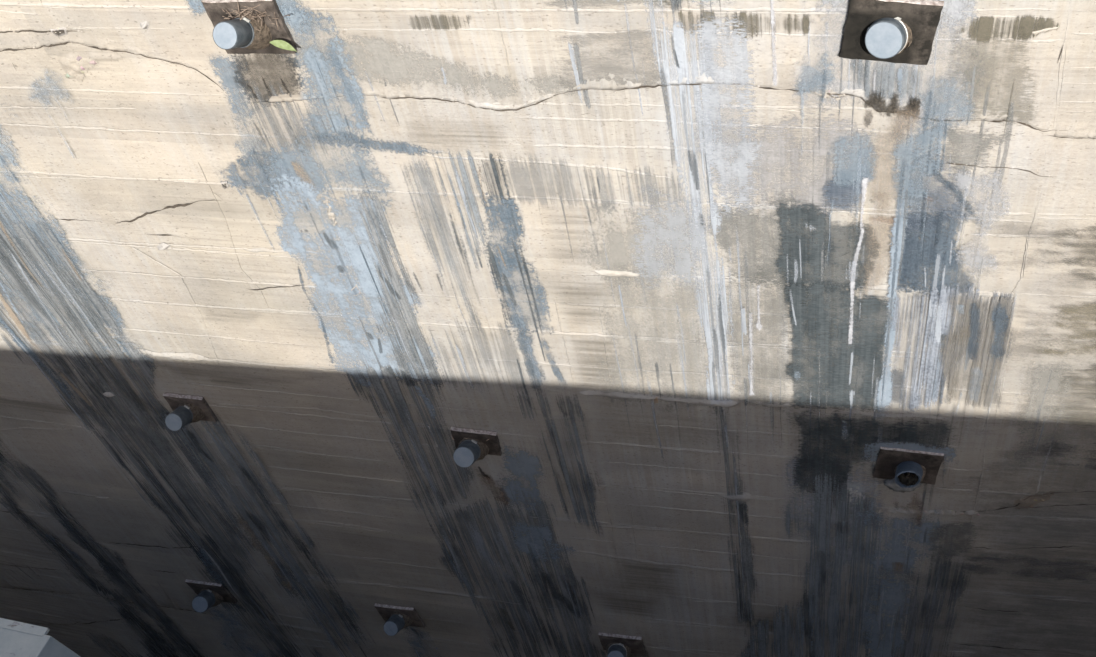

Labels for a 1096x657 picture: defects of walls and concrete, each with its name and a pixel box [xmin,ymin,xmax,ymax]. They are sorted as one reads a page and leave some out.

crack [0,19,1096,140]
crack [116,191,220,237]
crack [914,150,1060,177]
water stain [210,0,1015,657]
water stain [0,125,367,657]